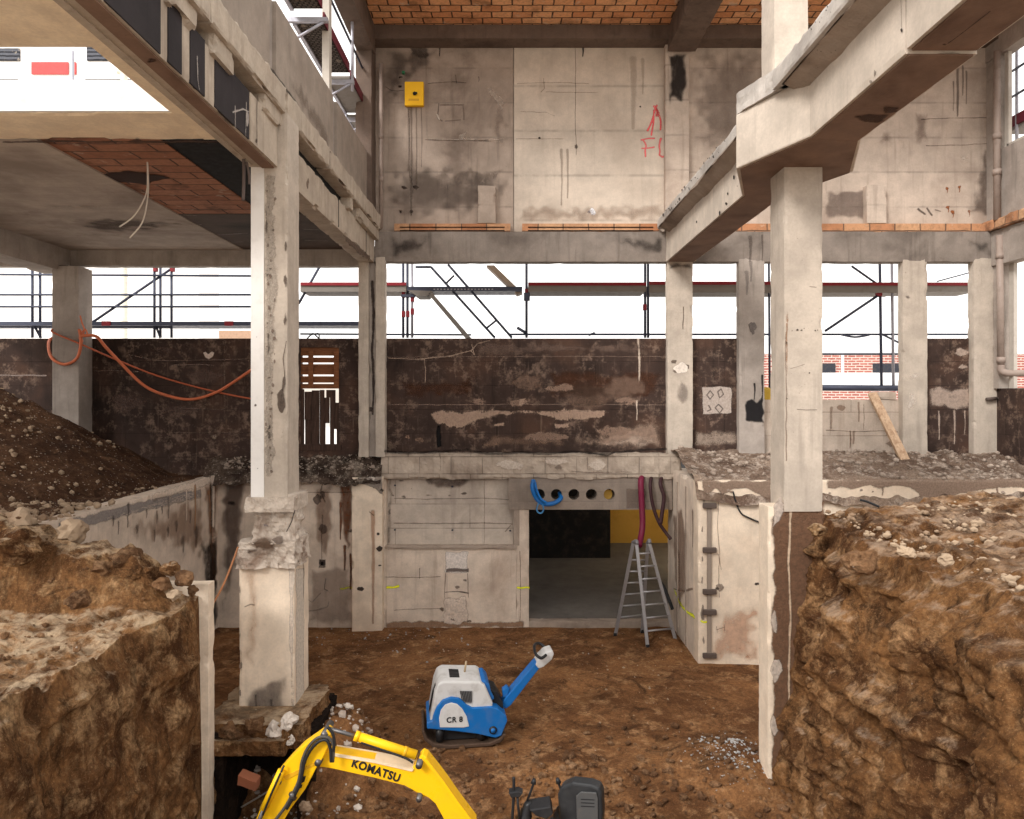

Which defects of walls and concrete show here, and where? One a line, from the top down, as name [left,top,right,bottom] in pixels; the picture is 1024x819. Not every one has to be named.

spalling [254,176,287,476]
spalling [235,481,326,706]
damp [318,490,330,548]
peeling [432,384,638,441]